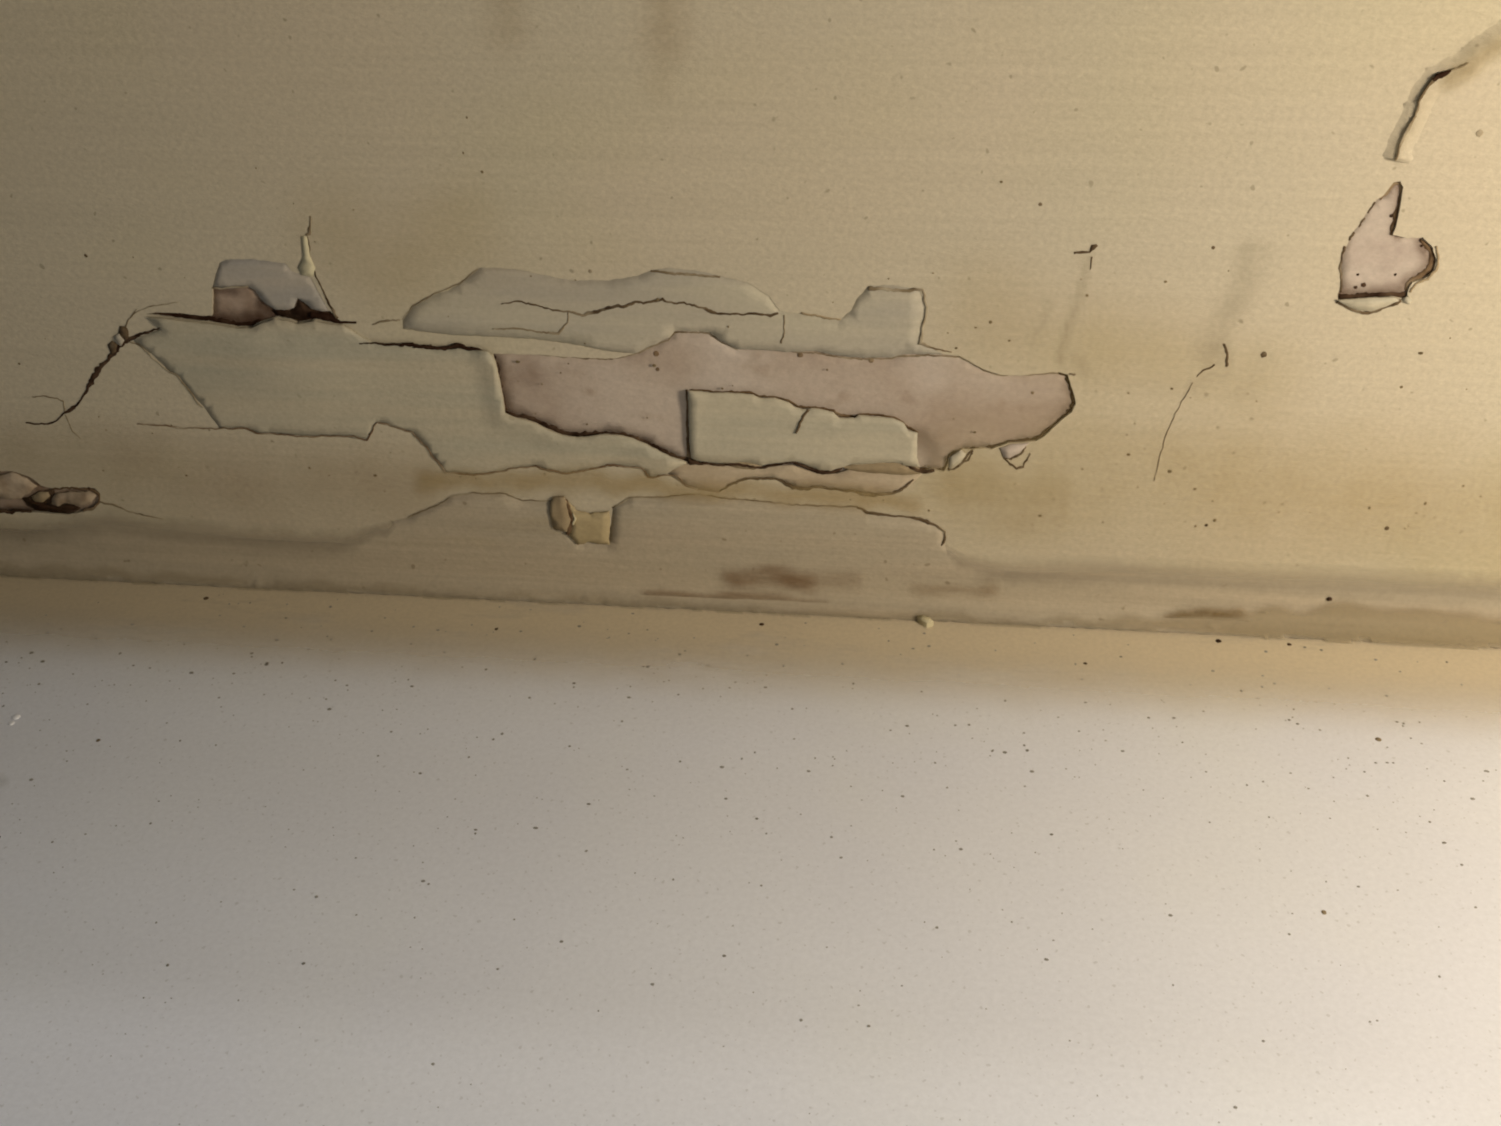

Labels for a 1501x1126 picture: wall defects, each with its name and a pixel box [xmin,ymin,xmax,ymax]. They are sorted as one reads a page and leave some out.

peeling [1336,181,1440,315]
crack [26,302,179,439]
peeling [152,216,1076,497]
spalling [0,471,165,520]
peeling [549,496,610,545]